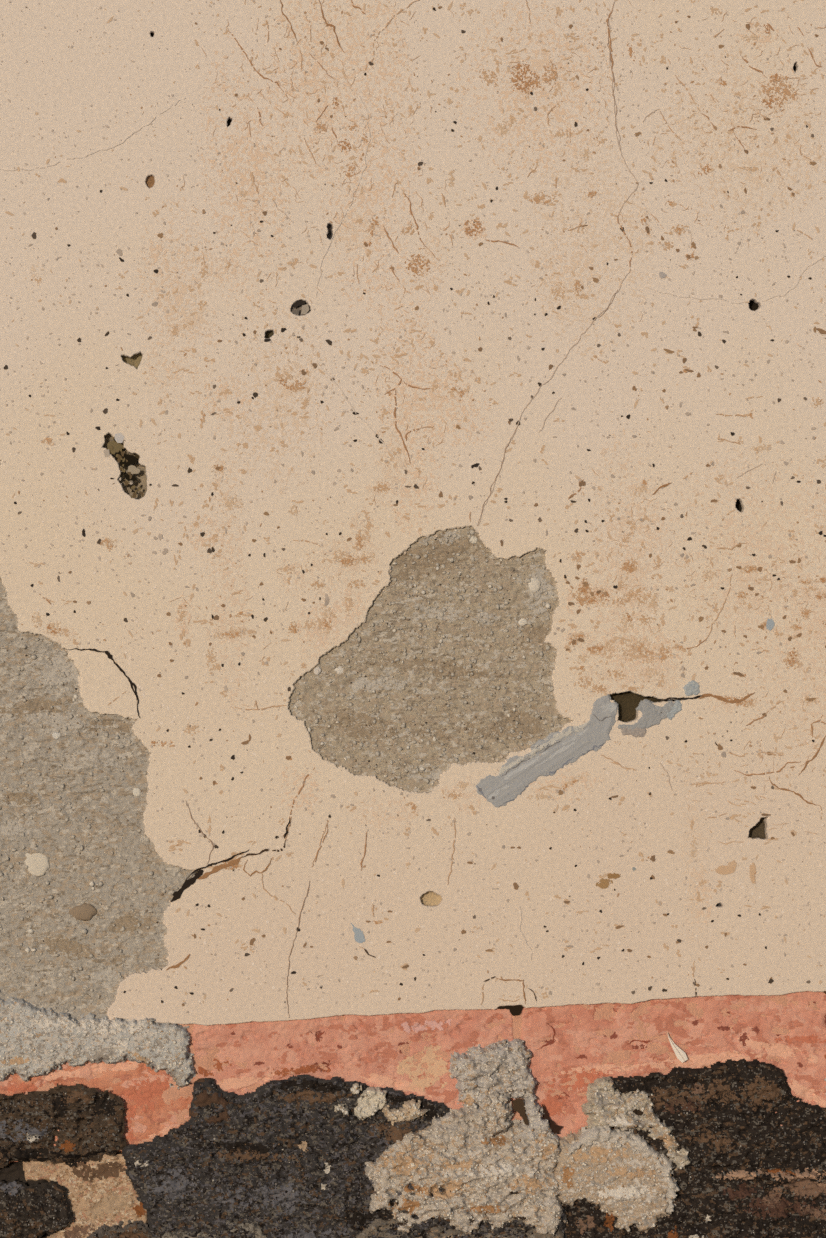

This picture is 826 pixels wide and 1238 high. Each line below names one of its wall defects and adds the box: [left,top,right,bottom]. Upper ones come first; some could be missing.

crack [469,0,826,526]
hole [95,408,147,499]
spalling [0,578,200,1020]
crack [64,648,140,718]
crack [170,767,329,1041]
spalling [288,526,581,793]
spalling [717,1012,760,1046]
crack [659,692,826,820]